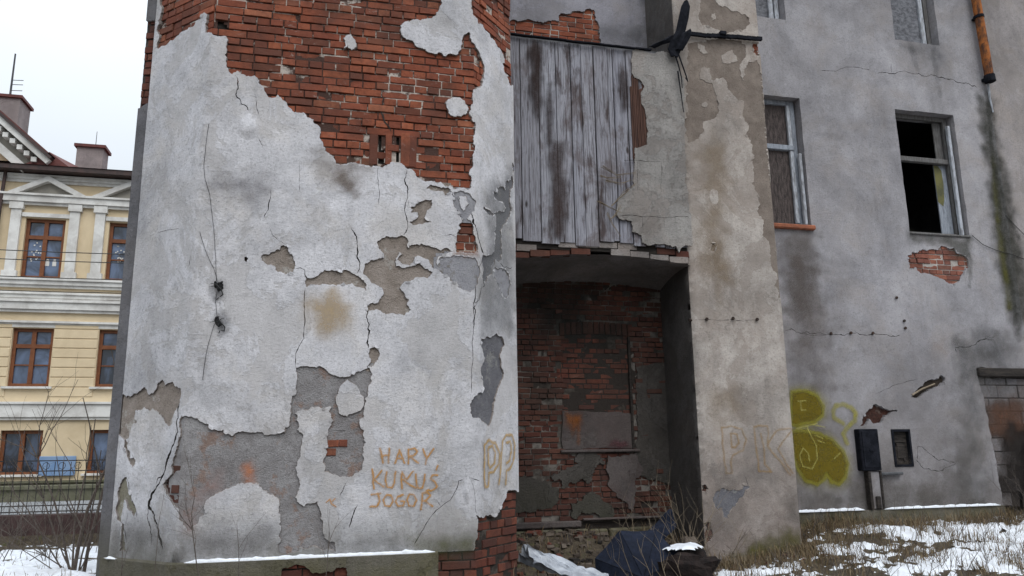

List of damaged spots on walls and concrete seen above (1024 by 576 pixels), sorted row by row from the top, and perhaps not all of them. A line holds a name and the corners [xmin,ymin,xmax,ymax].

crack [124,406,179,548]
flaking render [121,344,380,554]
leakage [315,291,344,330]
flaking render [158,0,513,316]
flaking render [438,491,519,576]
flaking render [470,334,503,426]
leakage [528,45,567,236]
flaking render [684,0,780,300]
crack [789,328,899,337]
flaking render [861,405,895,426]
flaking render [907,246,968,285]
leakage [980,98,1024,331]